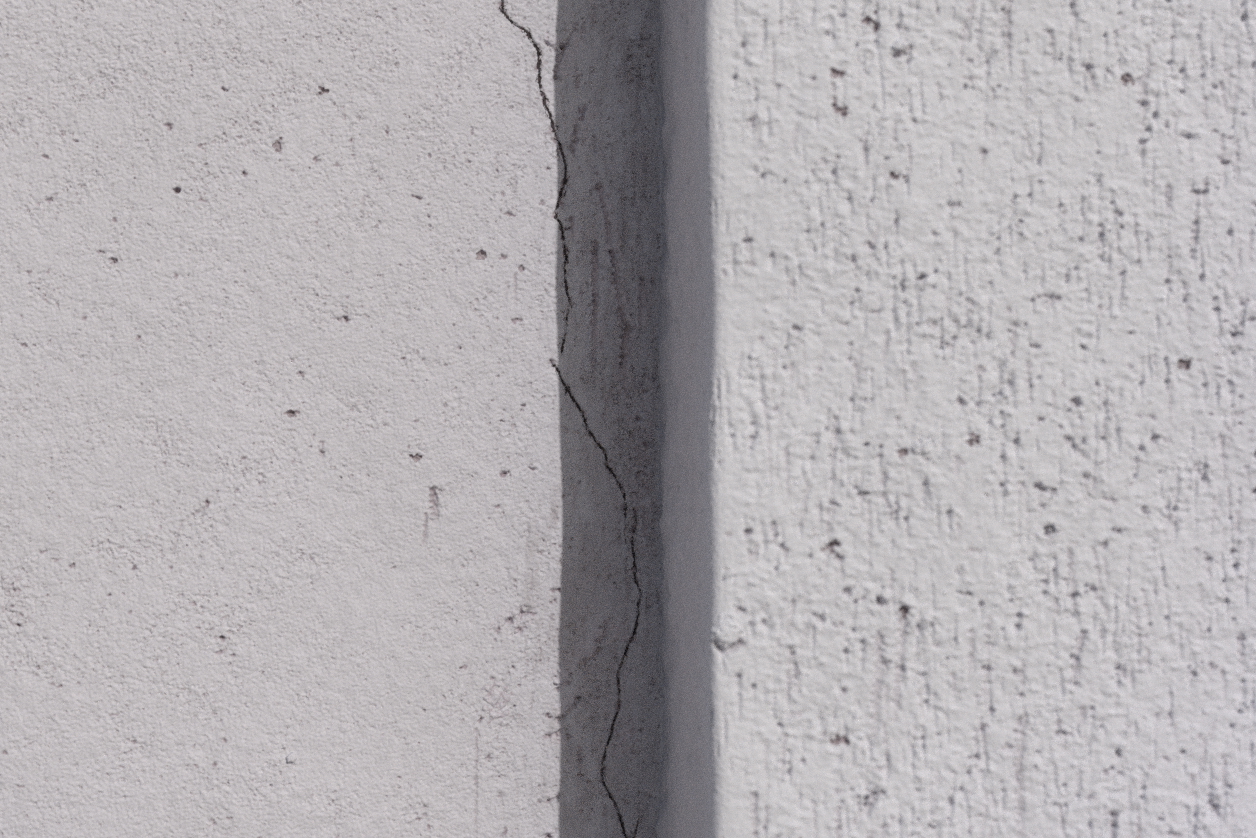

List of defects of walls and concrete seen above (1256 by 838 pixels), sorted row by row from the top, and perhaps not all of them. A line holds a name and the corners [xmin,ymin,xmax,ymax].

crack [499,2,643,838]